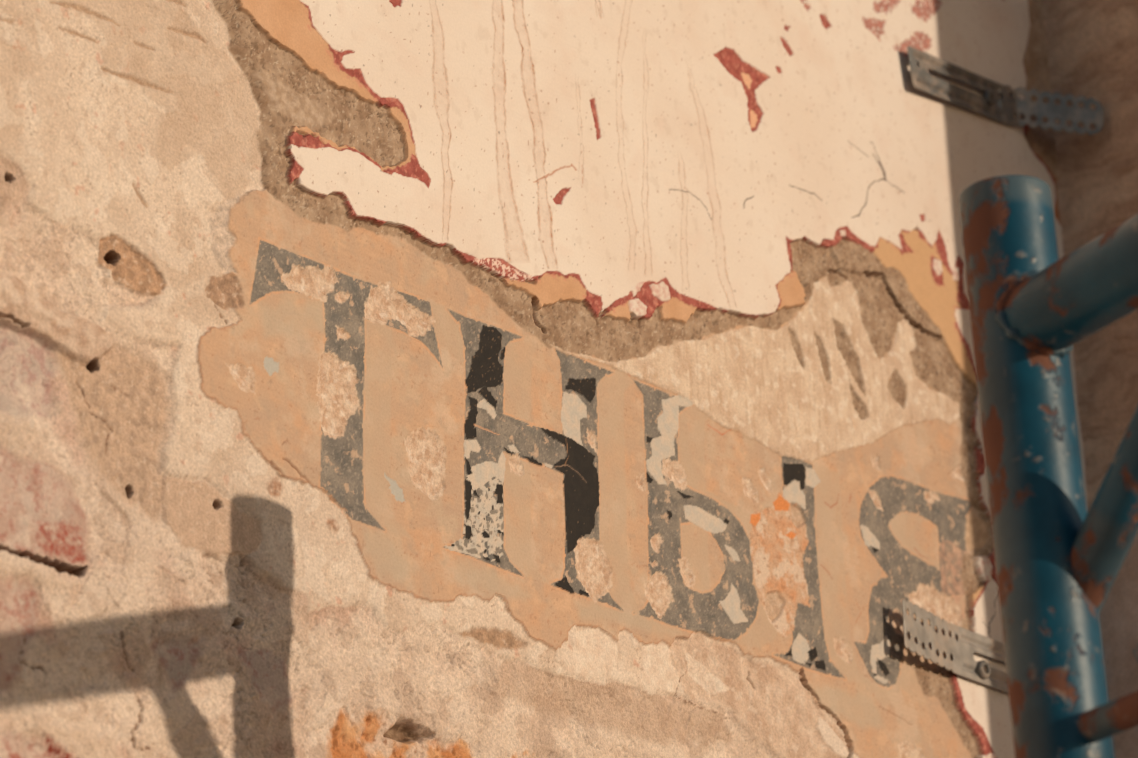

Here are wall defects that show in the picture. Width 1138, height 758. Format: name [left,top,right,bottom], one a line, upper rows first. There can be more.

spalling [98,233,168,295]
spalling [205,193,244,309]
crack [0,313,28,328]
spalling [214,0,997,637]
crack [0,544,88,576]
spalling [459,626,528,649]